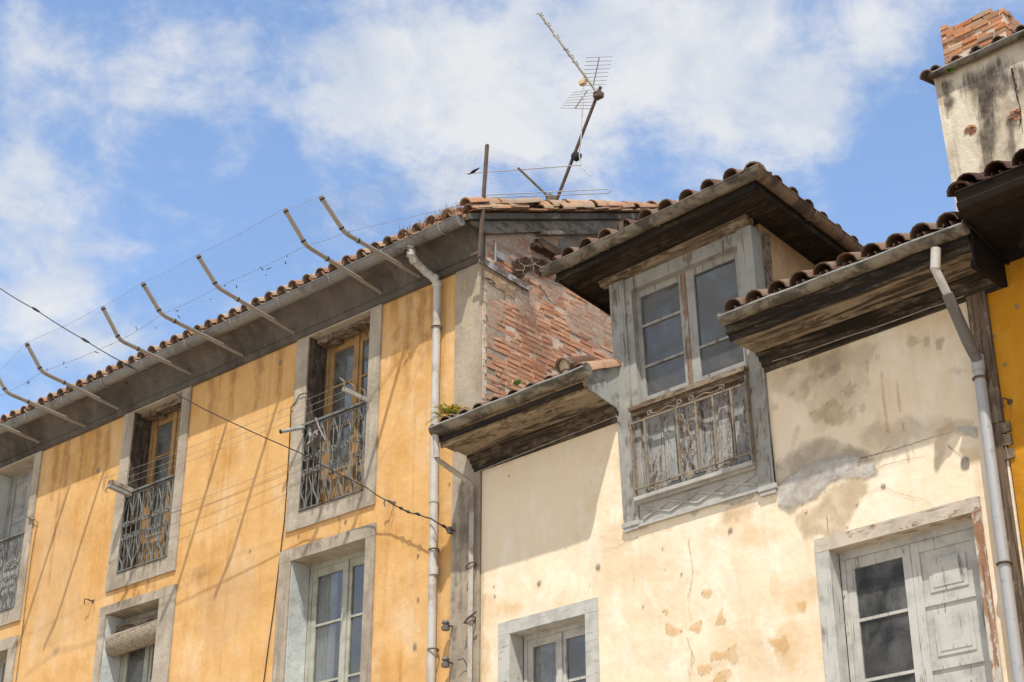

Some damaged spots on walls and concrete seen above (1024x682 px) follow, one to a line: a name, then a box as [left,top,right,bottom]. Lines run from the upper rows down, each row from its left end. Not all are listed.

leakage [963,59,1024,166]
crack [1011,68,1023,132]
crack [827,432,961,535]
crack [599,527,694,677]